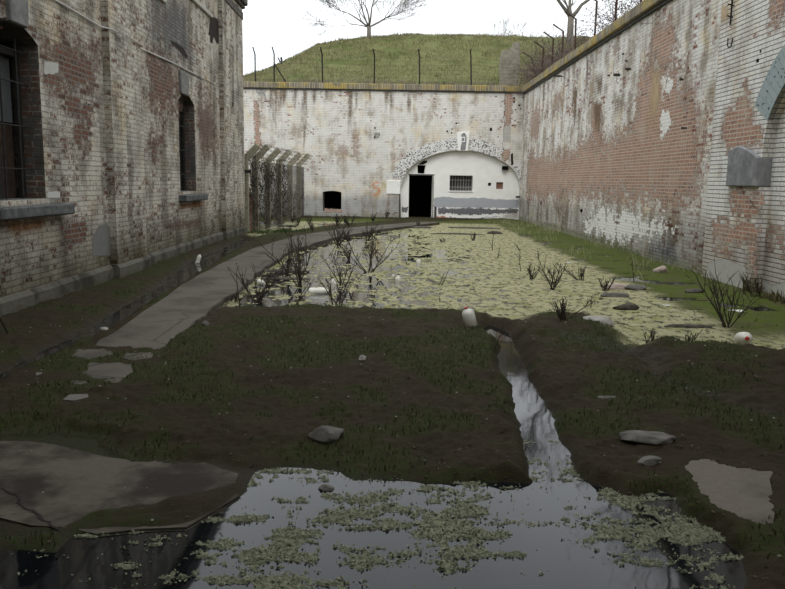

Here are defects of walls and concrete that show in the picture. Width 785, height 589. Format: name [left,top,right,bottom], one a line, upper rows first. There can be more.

flaking render [767,0,785,35]
flaking render [37,25,100,159]
water stain [270,90,315,107]
flaking render [433,12,710,218]
flaking render [721,78,764,155]
flaking render [711,187,785,259]